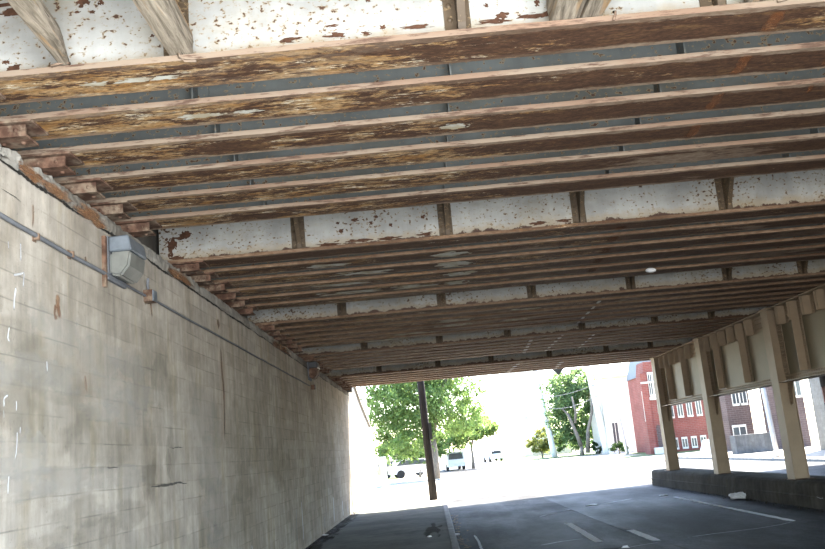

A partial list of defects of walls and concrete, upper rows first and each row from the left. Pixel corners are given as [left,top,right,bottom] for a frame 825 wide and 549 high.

peeling [475,0,548,25]